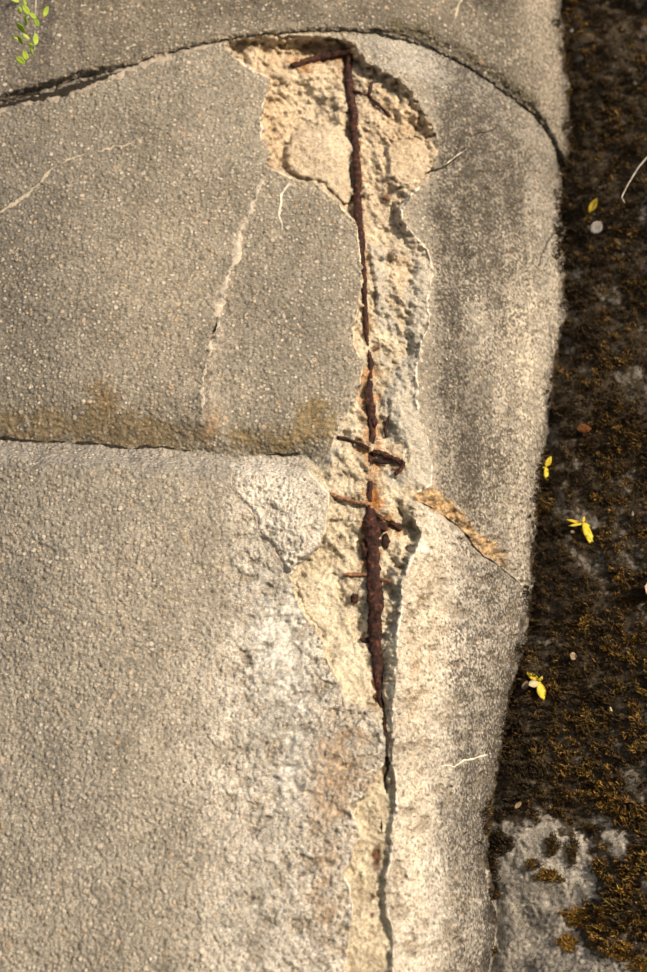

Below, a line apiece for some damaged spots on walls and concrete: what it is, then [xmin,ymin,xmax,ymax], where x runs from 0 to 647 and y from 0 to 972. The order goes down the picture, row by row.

crack [424,128,496,175]
leakage [0,193,261,449]
spalling [20,34,439,972]
crack [199,172,290,412]
leakage [229,399,337,455]
rust [354,368,403,580]
rust [307,727,364,831]